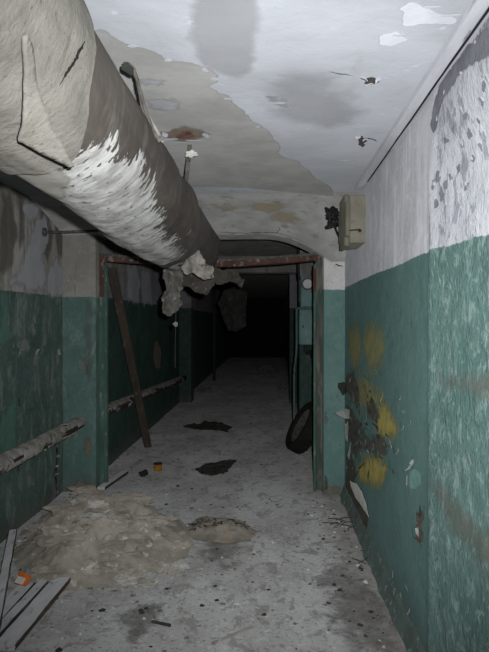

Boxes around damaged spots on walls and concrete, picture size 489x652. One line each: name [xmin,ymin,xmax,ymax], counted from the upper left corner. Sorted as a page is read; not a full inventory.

water stain [196,0,254,75]
flaking render [379,32,408,46]
flaking render [399,2,461,26]
spalling [361,77,382,86]
peeling [430,28,489,133]
corrosion [160,126,209,143]
peeling [94,30,334,196]
peeling [431,164,461,208]
water stain [0,194,23,271]
water stain [41,210,63,259]
peeling [324,369,399,531]
peeling [404,459,421,490]